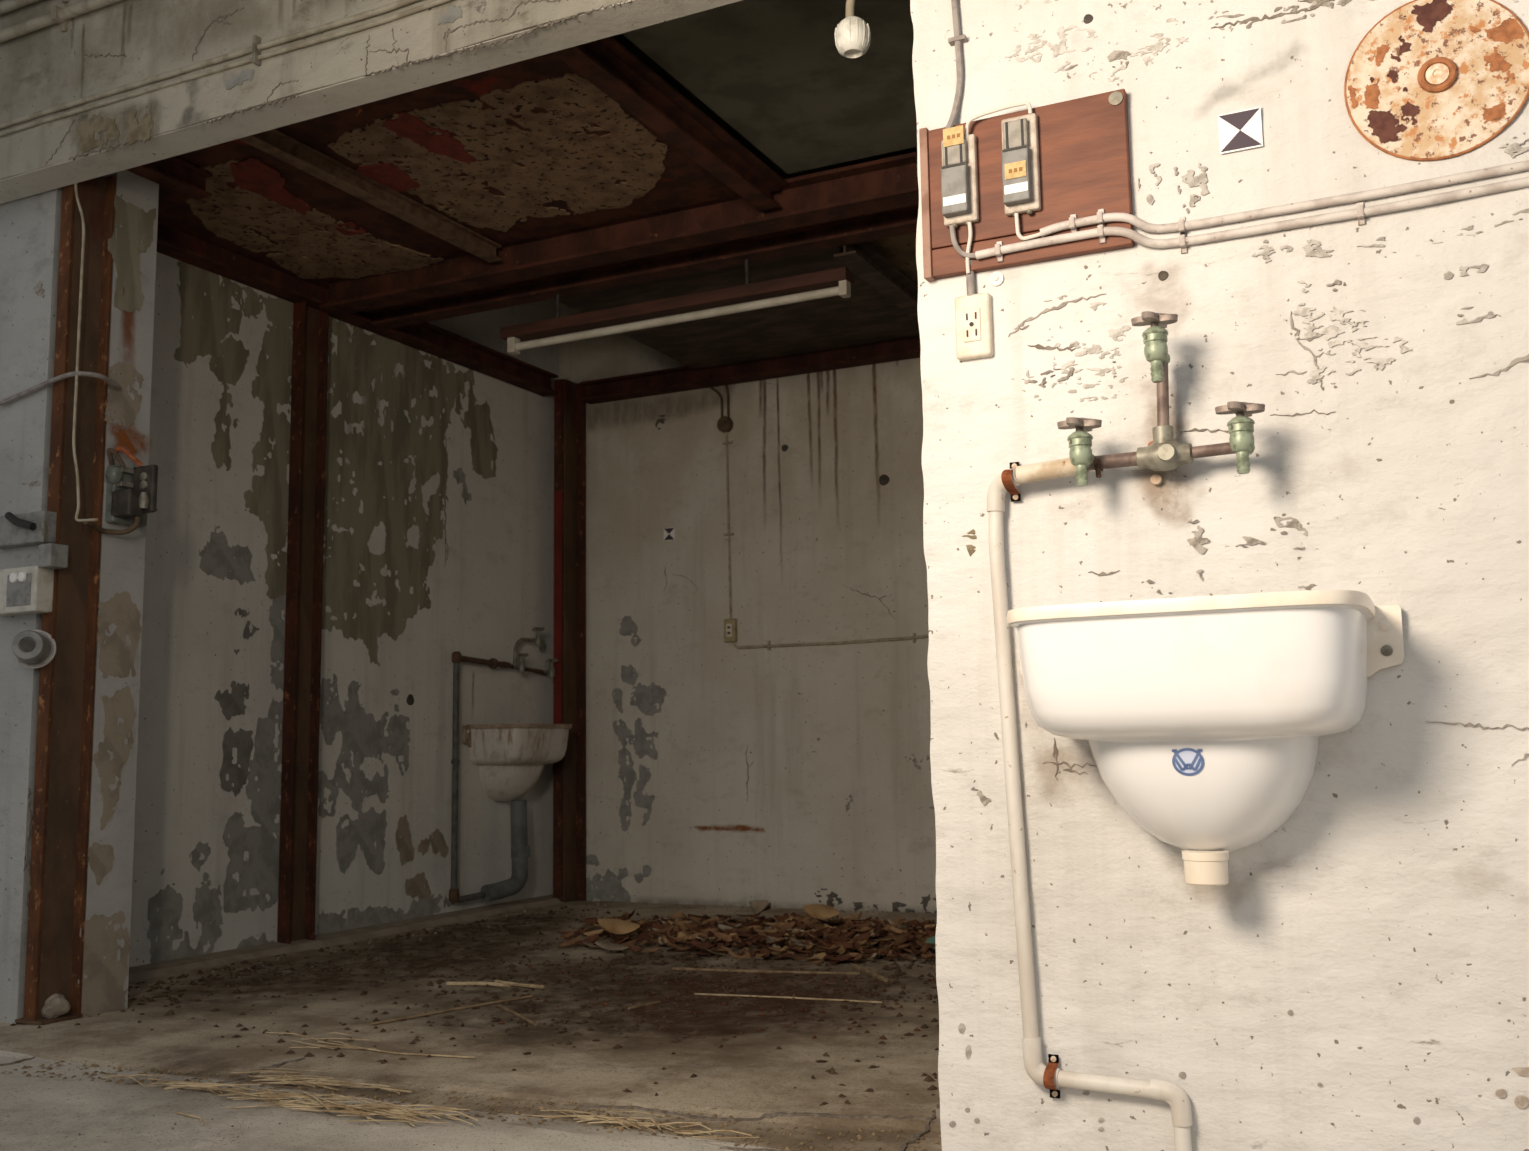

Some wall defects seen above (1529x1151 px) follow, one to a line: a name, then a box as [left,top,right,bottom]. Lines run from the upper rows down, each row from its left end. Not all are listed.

crack [1211,0,1334,29]
peeling [327,73,668,232]
peeling [186,157,444,279]
spalling [1443,264,1488,280]
spalling [1456,307,1501,325]
spalling [1458,208,1529,236]
peeling [322,318,498,666]
peeling [78,261,294,1016]
peeling [316,674,454,935]
peeling [612,616,667,832]
crack [1426,721,1529,766]
crack [579,1104,940,1151]